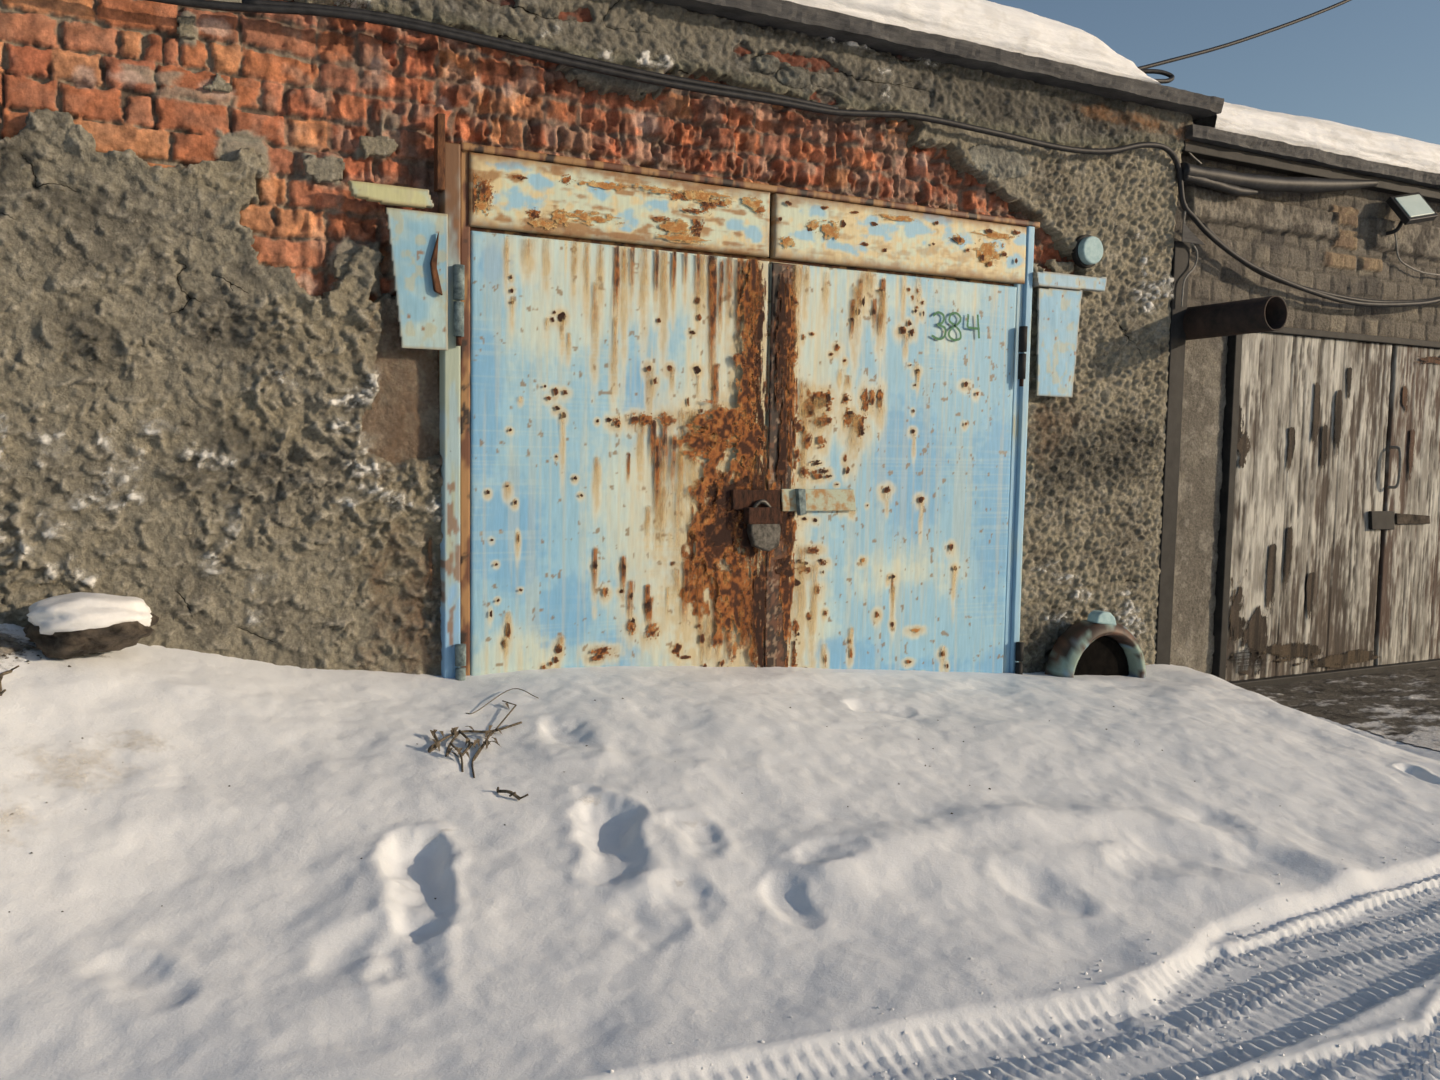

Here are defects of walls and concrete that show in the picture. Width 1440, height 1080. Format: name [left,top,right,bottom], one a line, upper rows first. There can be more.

flaking render [0,0,1075,465]
corrosion [526,207,624,250]
corrosion [806,206,914,240]
corrosion [953,229,1021,267]
corrosion [546,311,570,343]
corrosion [900,278,924,343]
peeling [1402,356,1440,412]
corrosion [559,174,886,668]
peeling [1237,406,1251,468]
peeling [1287,427,1295,471]
peeling [1312,367,1352,473]
peeling [1226,526,1380,677]